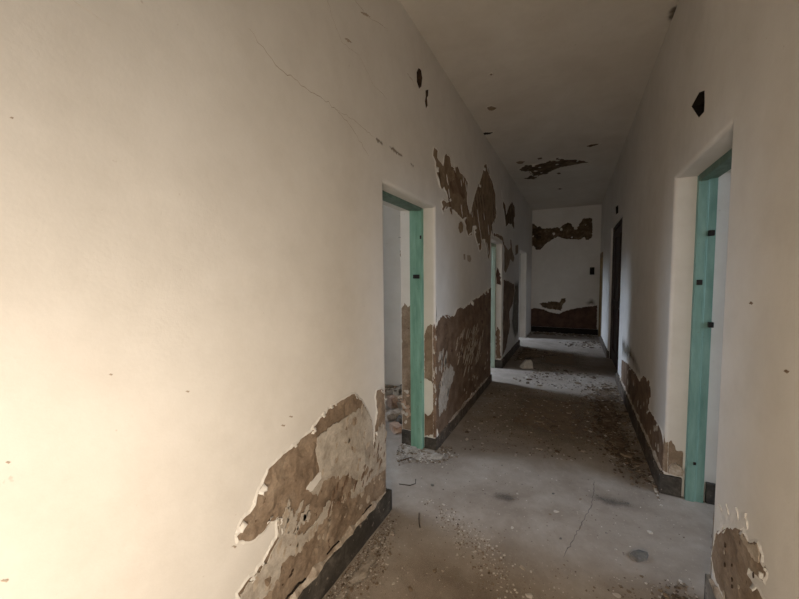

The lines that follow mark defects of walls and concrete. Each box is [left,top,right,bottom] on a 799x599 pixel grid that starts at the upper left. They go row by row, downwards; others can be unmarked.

spalling [417,68,428,108]
spalling [692,90,705,117]
spalling [516,157,592,180]
peeling [532,217,594,251]
peeling [424,145,518,438]
flaking render [531,298,598,329]
peeling [621,358,684,477]
peeling [232,303,411,599]
peeling [711,503,769,599]